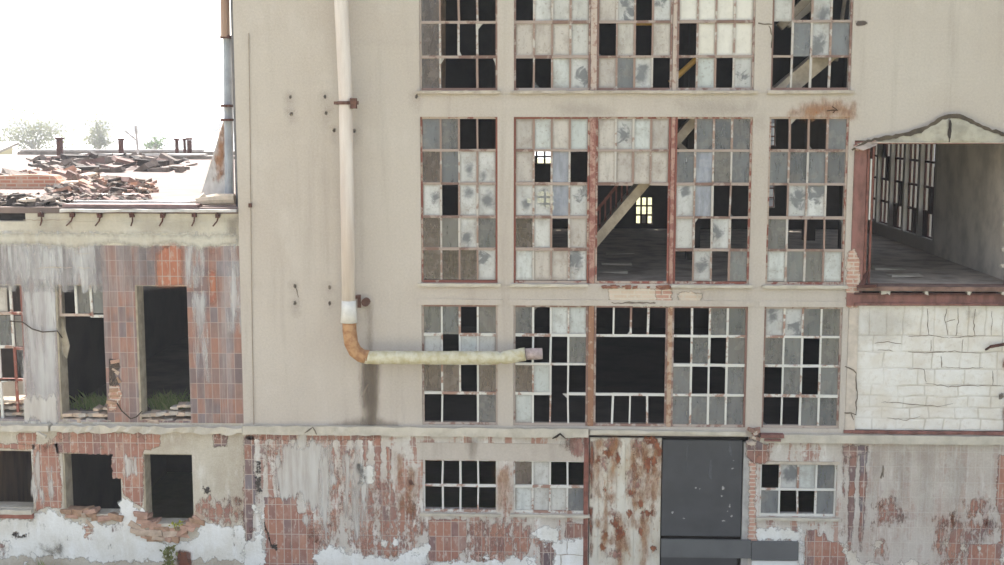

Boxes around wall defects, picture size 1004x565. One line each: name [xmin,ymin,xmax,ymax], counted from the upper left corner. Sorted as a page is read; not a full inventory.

rust [805,104,852,116]
peeling [157,244,182,286]
spalling [845,249,861,308]
crack [845,309,1001,421]
peeling [0,359,583,565]
rust [565,436,663,562]
peeling [746,427,929,565]
peeling [932,455,1004,565]